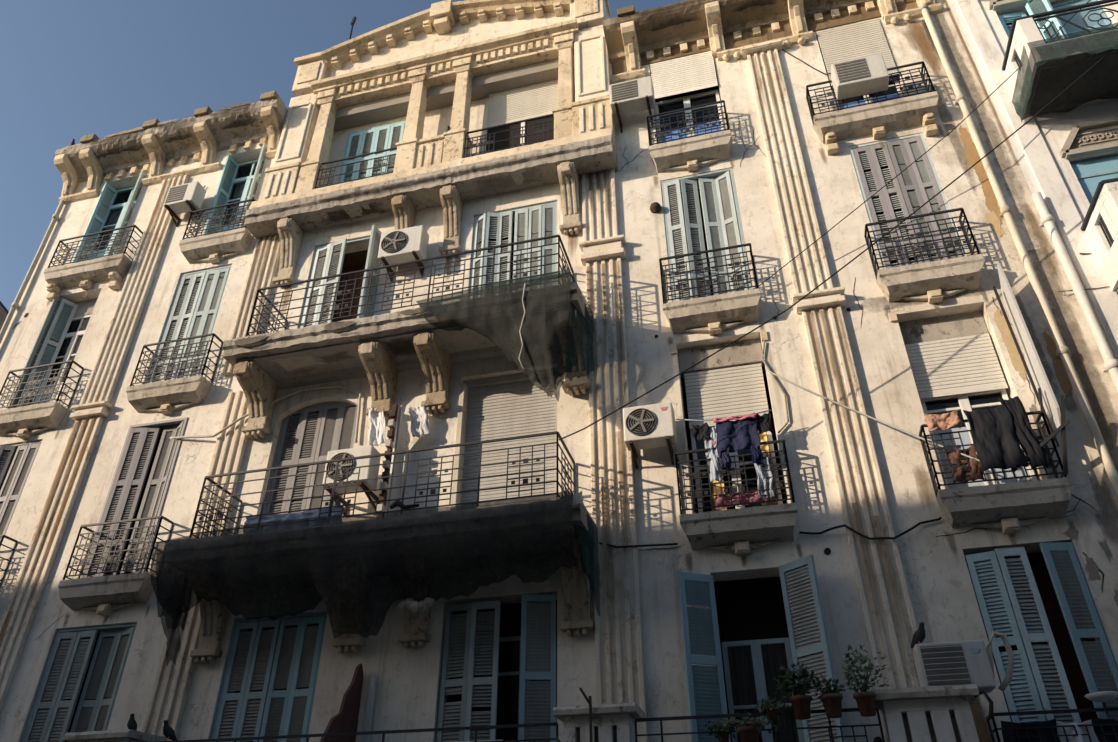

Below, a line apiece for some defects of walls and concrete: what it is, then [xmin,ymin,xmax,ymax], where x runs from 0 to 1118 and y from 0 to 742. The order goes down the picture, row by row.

peeling [958,123,1005,238]
damp [906,0,1118,471]
peeling [1062,470,1118,606]
spalling [397,598,435,613]
damp [970,697,992,742]